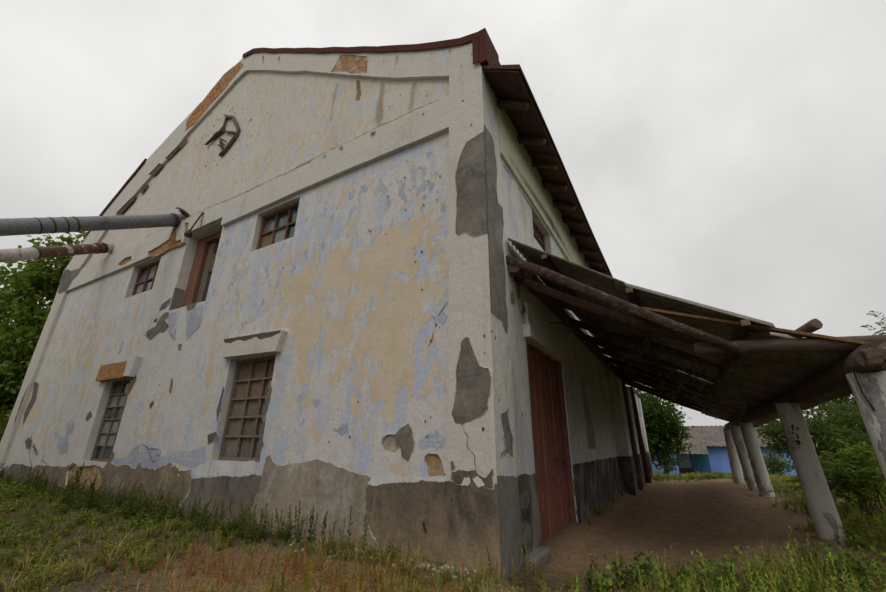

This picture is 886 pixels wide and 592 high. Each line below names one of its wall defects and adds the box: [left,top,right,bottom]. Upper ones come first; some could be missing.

flaking render [117,62,251,214]
flaking render [332,55,368,101]
peeling [18,150,495,513]
peeling [859,375,886,462]